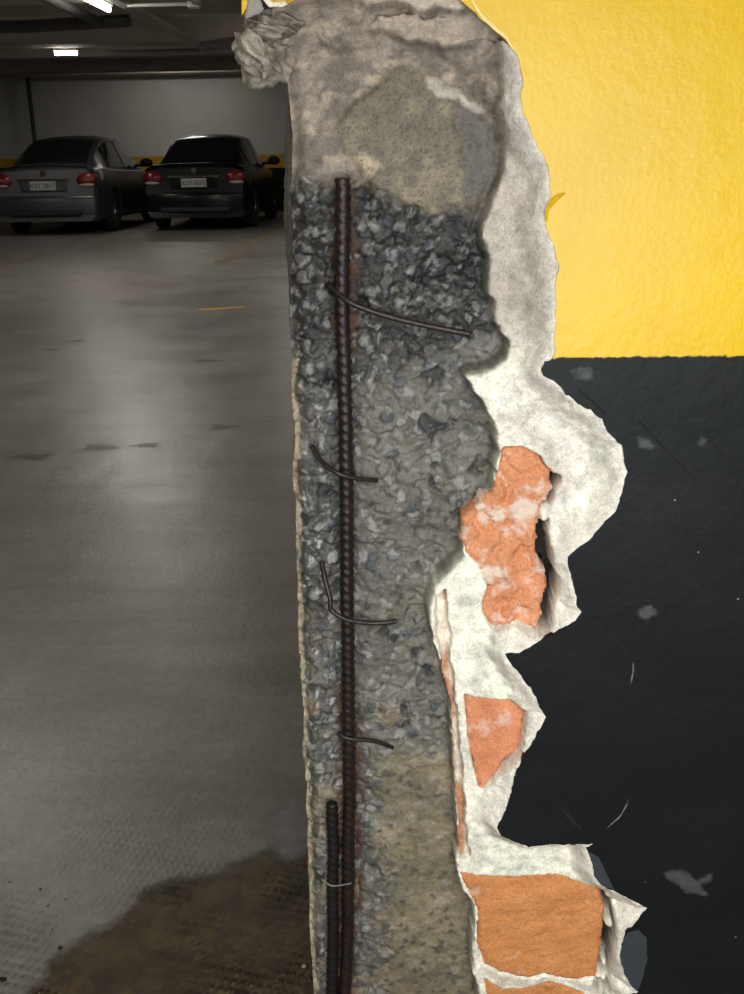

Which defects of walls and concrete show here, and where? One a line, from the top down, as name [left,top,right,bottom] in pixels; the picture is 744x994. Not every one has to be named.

water stain [28,796,314,994]
spalling [231,0,647,994]